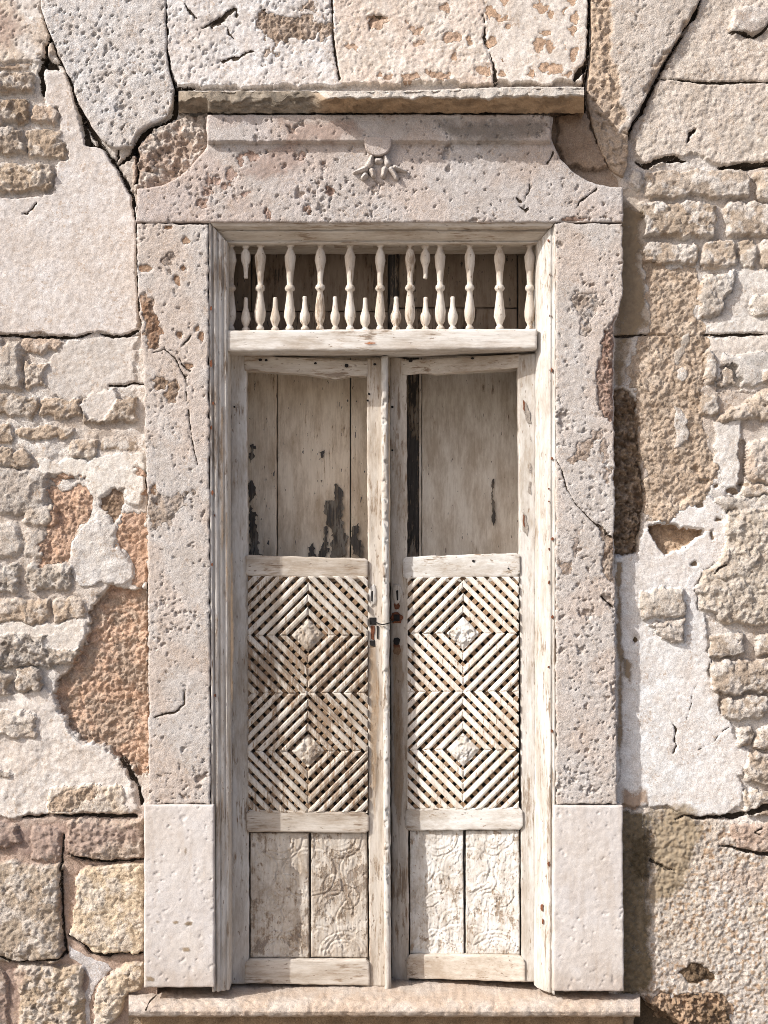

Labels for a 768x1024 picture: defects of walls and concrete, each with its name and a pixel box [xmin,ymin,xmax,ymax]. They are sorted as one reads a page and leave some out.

crack [0,3,254,340]
crack [628,1,768,169]
crack [717,161,768,171]
crack [557,462,612,538]
spalling [567,255,749,583]
spalling [37,467,196,775]
crack [675,804,768,856]